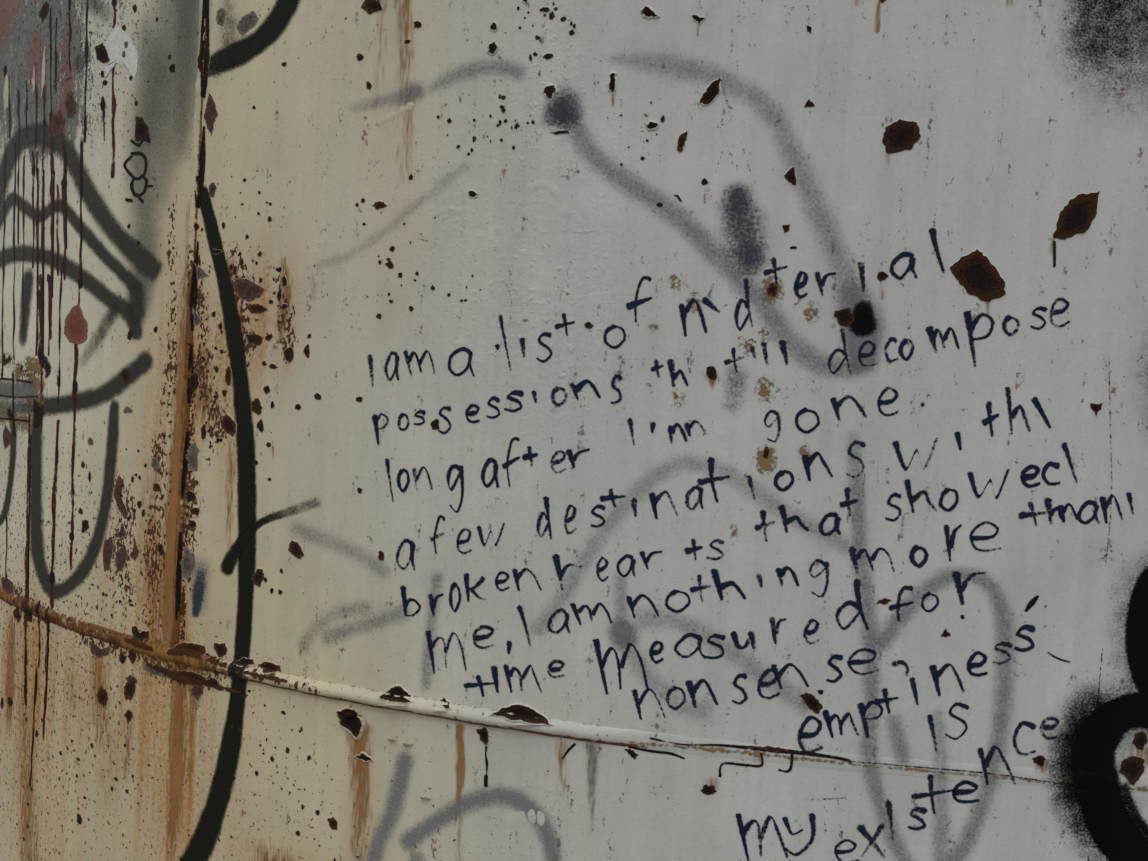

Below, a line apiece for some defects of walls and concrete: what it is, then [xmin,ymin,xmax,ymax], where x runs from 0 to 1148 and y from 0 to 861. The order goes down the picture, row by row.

peeling [361,0,384,15]
rust [400,0,410,68]
rust [0,203,320,861]
peeling [378,684,414,706]
peeling [433,694,452,712]
peeling [475,702,553,747]
peeling [354,751,374,762]
rust [351,725,369,845]